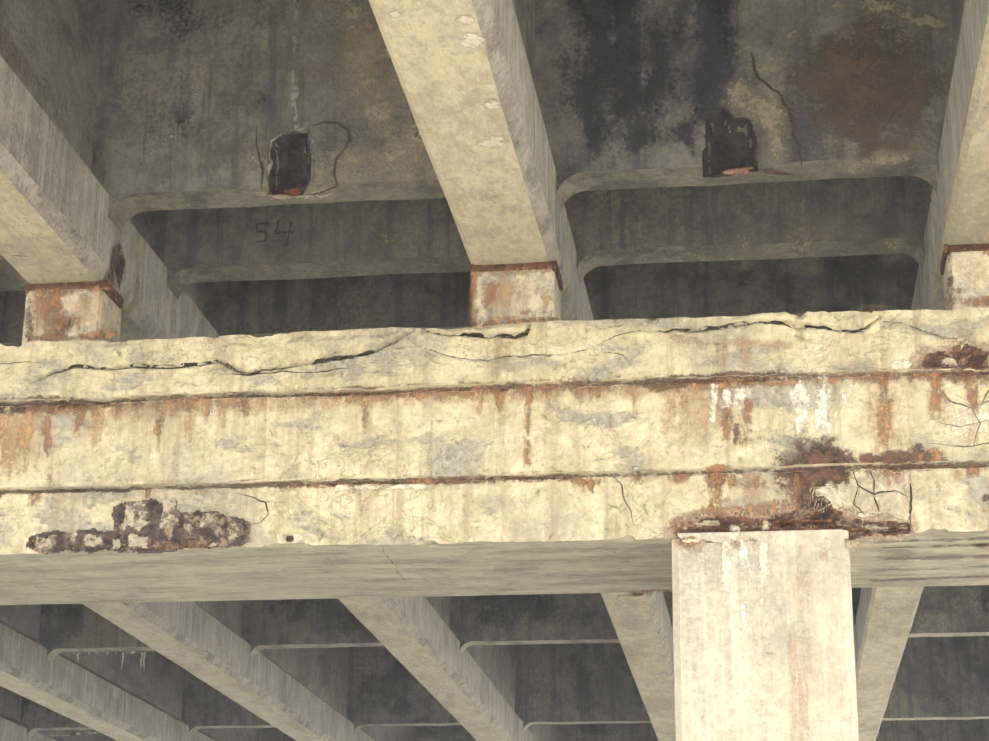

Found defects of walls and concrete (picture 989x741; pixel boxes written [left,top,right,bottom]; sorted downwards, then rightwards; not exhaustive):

damp [560,0,737,162]
spalling [702,52,803,178]
spalling [255,128,314,199]
corrosion [24,284,116,342]
corrosion [0,395,288,461]
crack [0,342,397,376]
corrosion [469,265,559,327]
corrosion [279,339,946,514]
crack [424,318,966,374]
spalling [891,331,989,446]
crack [926,390,989,447]
spalling [26,497,251,555]